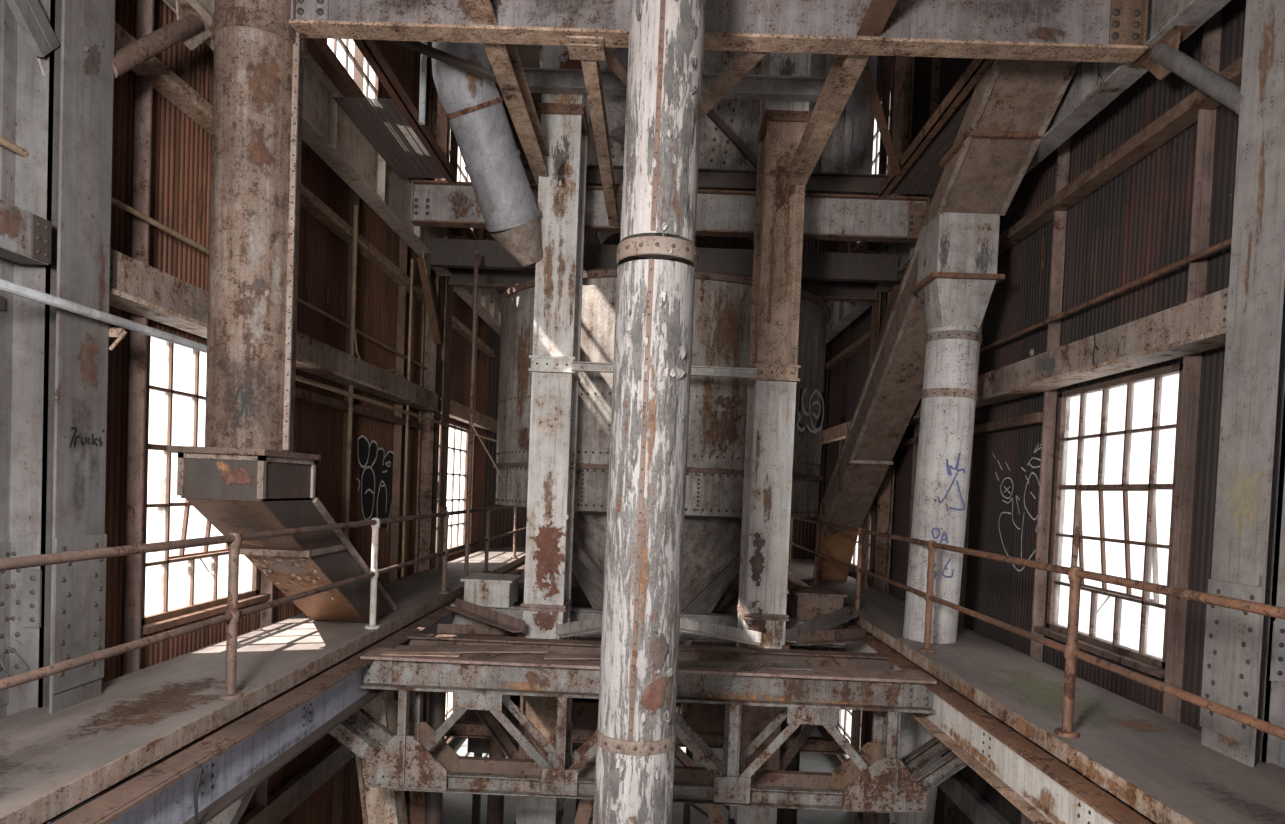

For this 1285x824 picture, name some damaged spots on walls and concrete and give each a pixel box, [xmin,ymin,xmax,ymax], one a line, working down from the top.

rust [246,43,281,113]
rust [247,129,272,167]
rust [0,207,25,239]
rust [78,246,105,389]
peeling [627,282,687,472]
rust [700,293,743,456]
rust [217,462,251,487]
peeling [639,630,673,722]
rust [945,725,996,771]
peeling [609,758,673,824]
rust [1024,789,1066,824]